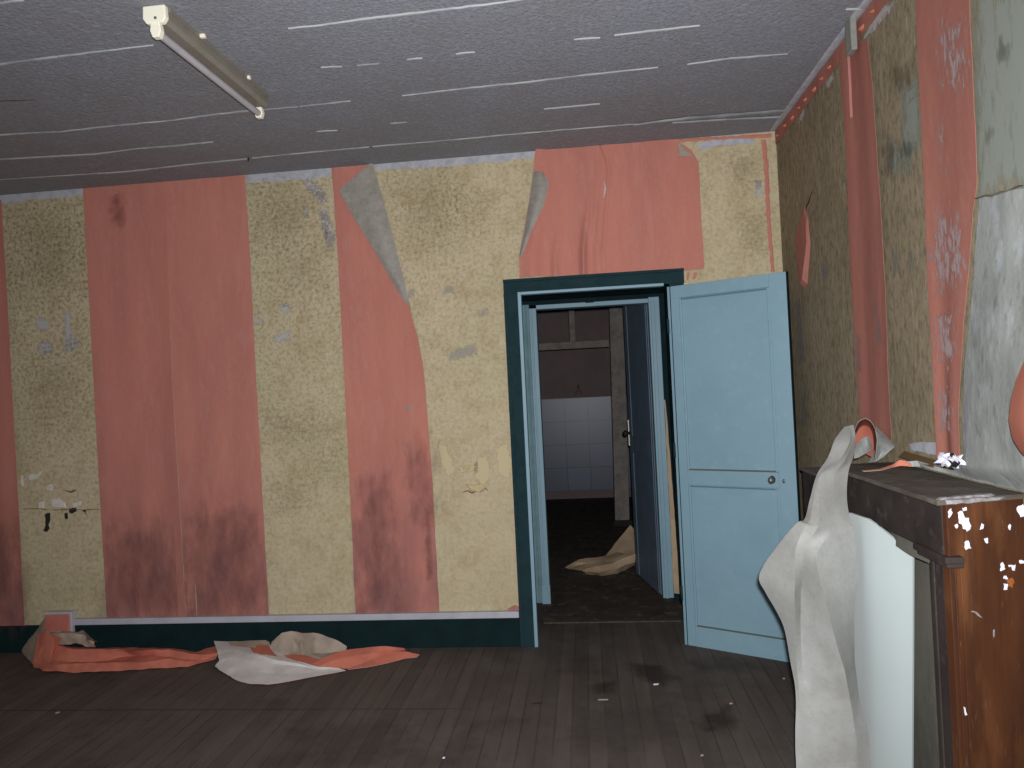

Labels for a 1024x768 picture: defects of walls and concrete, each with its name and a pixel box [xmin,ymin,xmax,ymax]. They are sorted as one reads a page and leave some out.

flaking render [21,471,86,532]